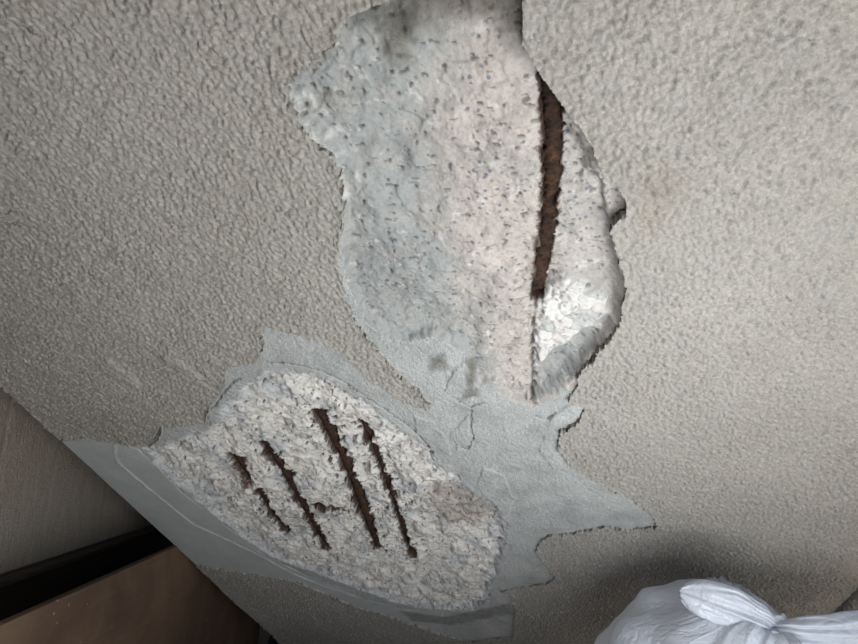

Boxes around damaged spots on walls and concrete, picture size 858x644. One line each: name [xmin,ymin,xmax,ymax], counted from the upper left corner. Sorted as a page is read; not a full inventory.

spalling [62,0,655,641]